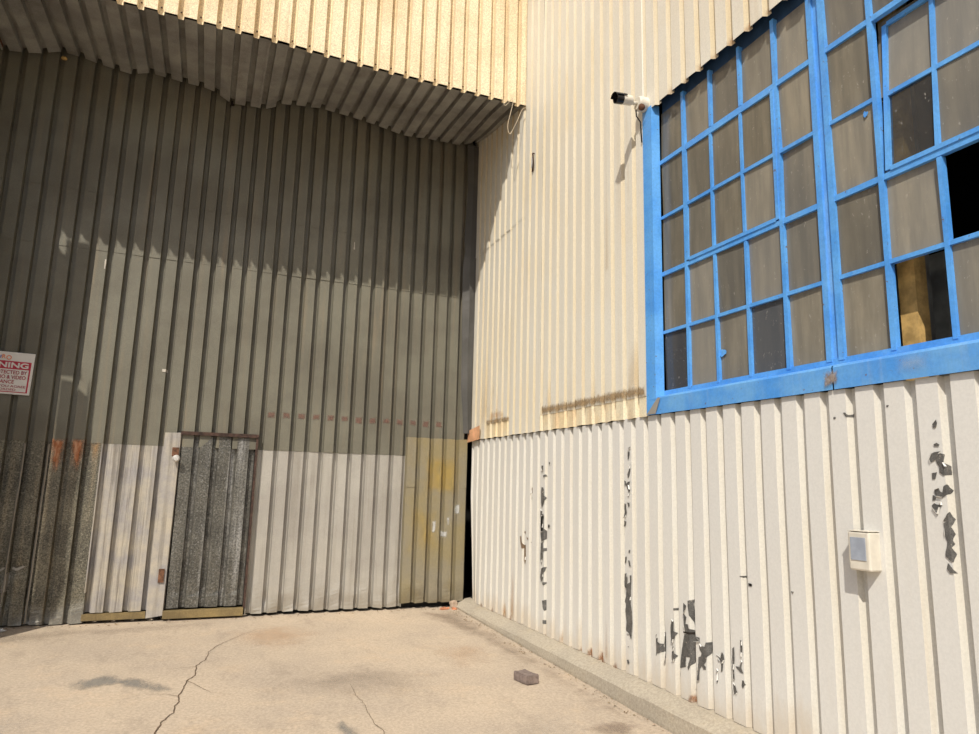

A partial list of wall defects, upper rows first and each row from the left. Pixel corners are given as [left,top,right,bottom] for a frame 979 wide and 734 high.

leakage [542,388,644,413]
corrosion [52,440,82,467]
peeling [520,462,550,585]
peeling [929,443,957,573]
crack [154,631,251,734]
peeling [624,550,632,647]
peeling [655,599,746,695]